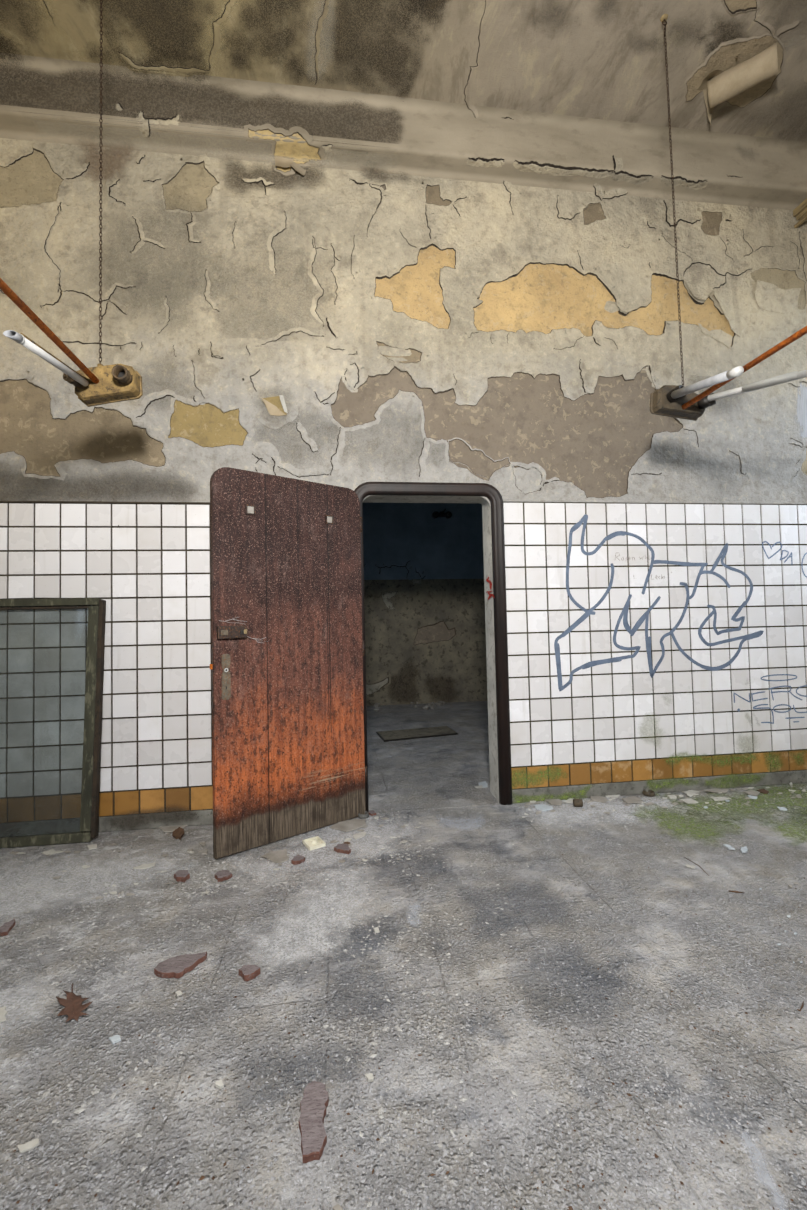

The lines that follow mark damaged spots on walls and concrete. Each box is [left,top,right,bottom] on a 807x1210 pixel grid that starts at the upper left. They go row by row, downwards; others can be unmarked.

water stain [0,0,399,146]
water stain [325,0,445,96]
peeling [683,33,786,124]
peeling [0,139,71,214]
peeling [157,154,226,218]
peeling [420,179,459,211]
peeling [577,196,612,230]
peeling [696,205,728,240]
crack [37,102,807,478]
peeling [369,238,750,353]
peeling [0,371,256,482]
peeling [327,332,686,500]